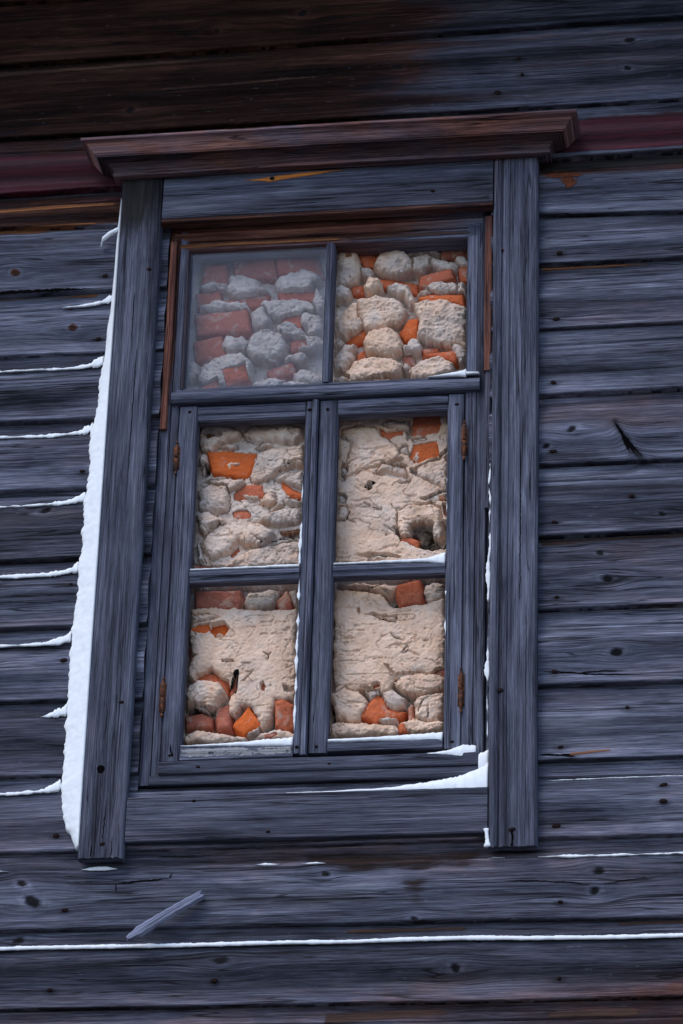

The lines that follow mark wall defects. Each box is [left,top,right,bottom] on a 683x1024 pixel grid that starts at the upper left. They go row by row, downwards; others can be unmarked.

crack [615,422,641,455]
spalling [413,531,446,551]
crack [519,437,653,720]